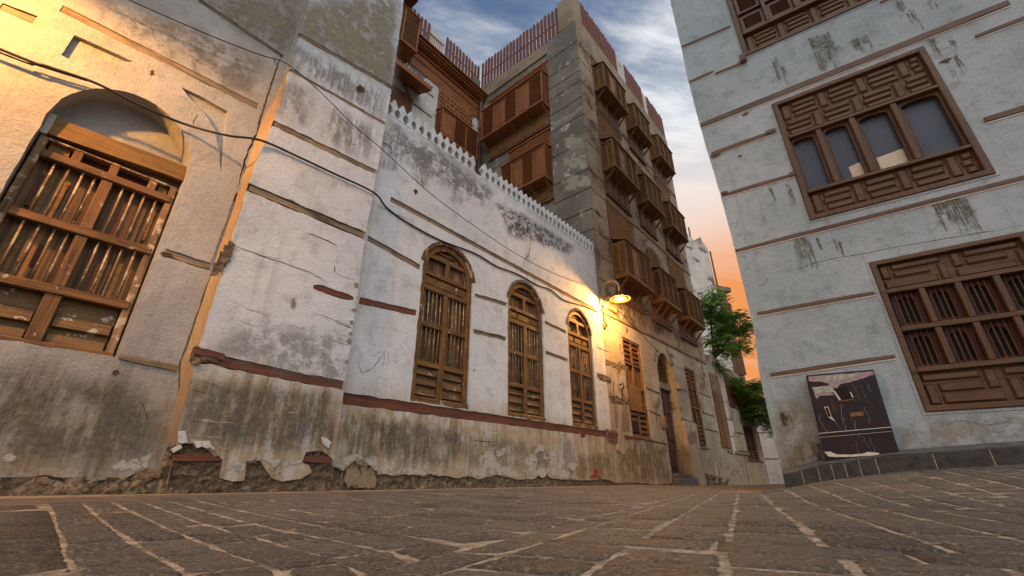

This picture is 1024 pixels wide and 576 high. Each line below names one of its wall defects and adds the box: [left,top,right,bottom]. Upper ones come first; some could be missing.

leakage [499,205,572,252]
leakage [933,198,981,233]
leakage [0,376,153,472]
flaking render [0,431,613,496]
leakage [334,419,549,475]
leakage [569,448,668,478]